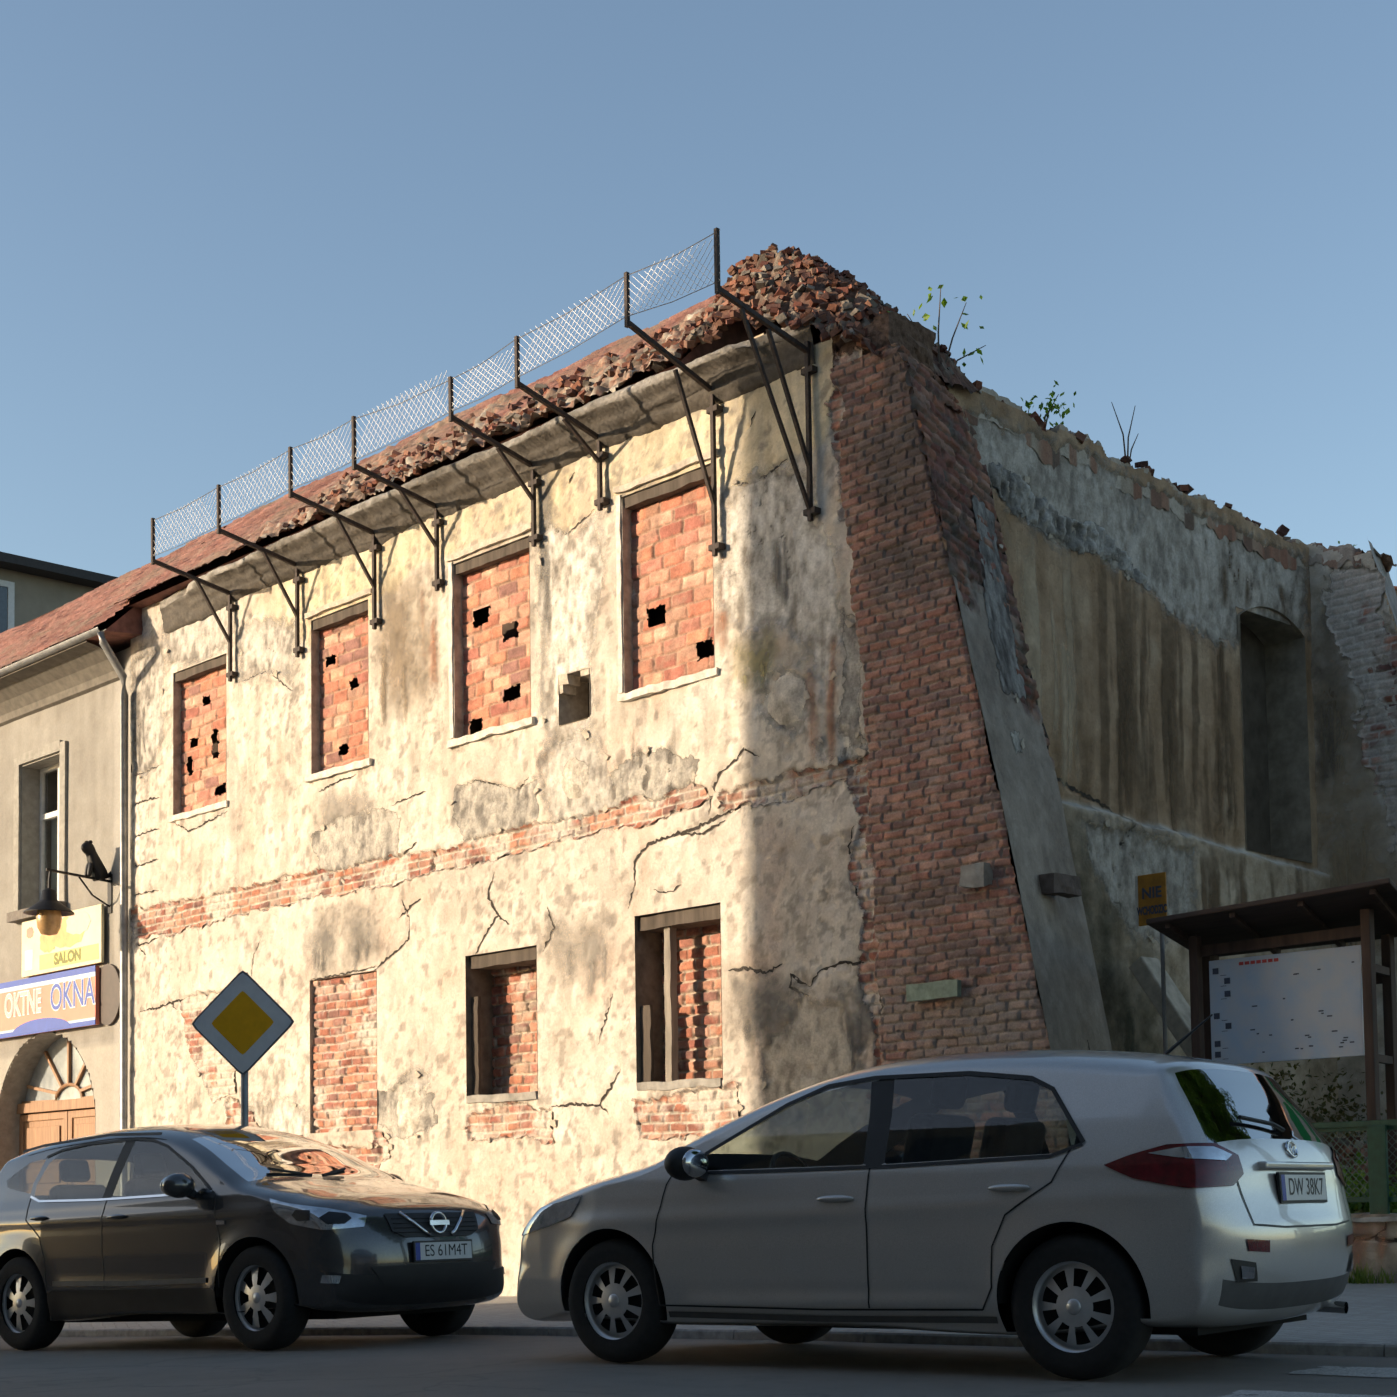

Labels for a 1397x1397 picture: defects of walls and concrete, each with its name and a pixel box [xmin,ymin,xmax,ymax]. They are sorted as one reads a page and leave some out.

flaking render [131,385,883,1066]
damp [1024,558,1075,783]
damp [1101,599,1199,831]
flaking render [967,413,1397,854]
damp [1217,637,1237,819]
crack [475,854,509,956]
crack [628,747,759,908]
crack [728,961,864,996]
flaking render [180,990,311,1139]
flaking render [329,1067,438,1169]
crack [551,1071,620,1113]
flaking render [632,1081,744,1141]